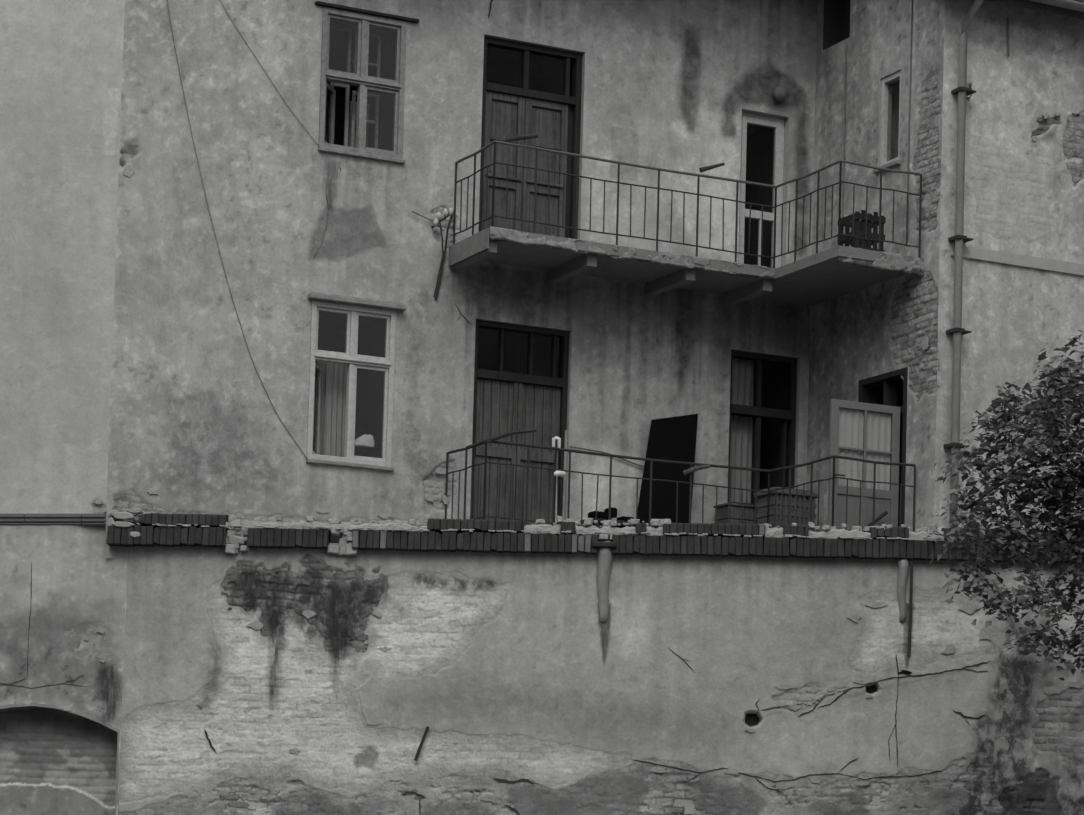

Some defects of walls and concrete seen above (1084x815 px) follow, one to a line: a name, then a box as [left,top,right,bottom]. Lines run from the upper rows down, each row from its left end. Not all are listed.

flaking render [973,137,1051,243]
flaking render [1031,112,1084,187]
damp [234,571,383,641]
flaking render [118,554,1062,815]
crack [631,655,991,792]